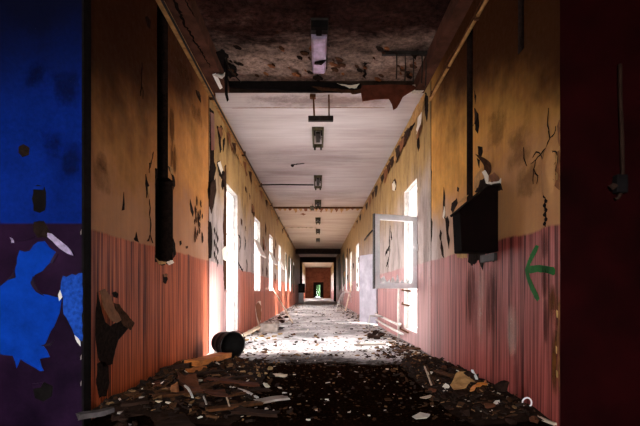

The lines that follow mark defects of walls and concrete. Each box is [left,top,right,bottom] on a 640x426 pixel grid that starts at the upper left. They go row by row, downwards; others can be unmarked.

spalling [216,49,244,78]
spalling [288,67,323,81]
peeling [145,166,158,198]
peeling [190,93,428,293]
crack [523,108,558,227]
peeling [0,221,83,371]
peeling [95,289,135,398]
spalling [155,239,188,266]